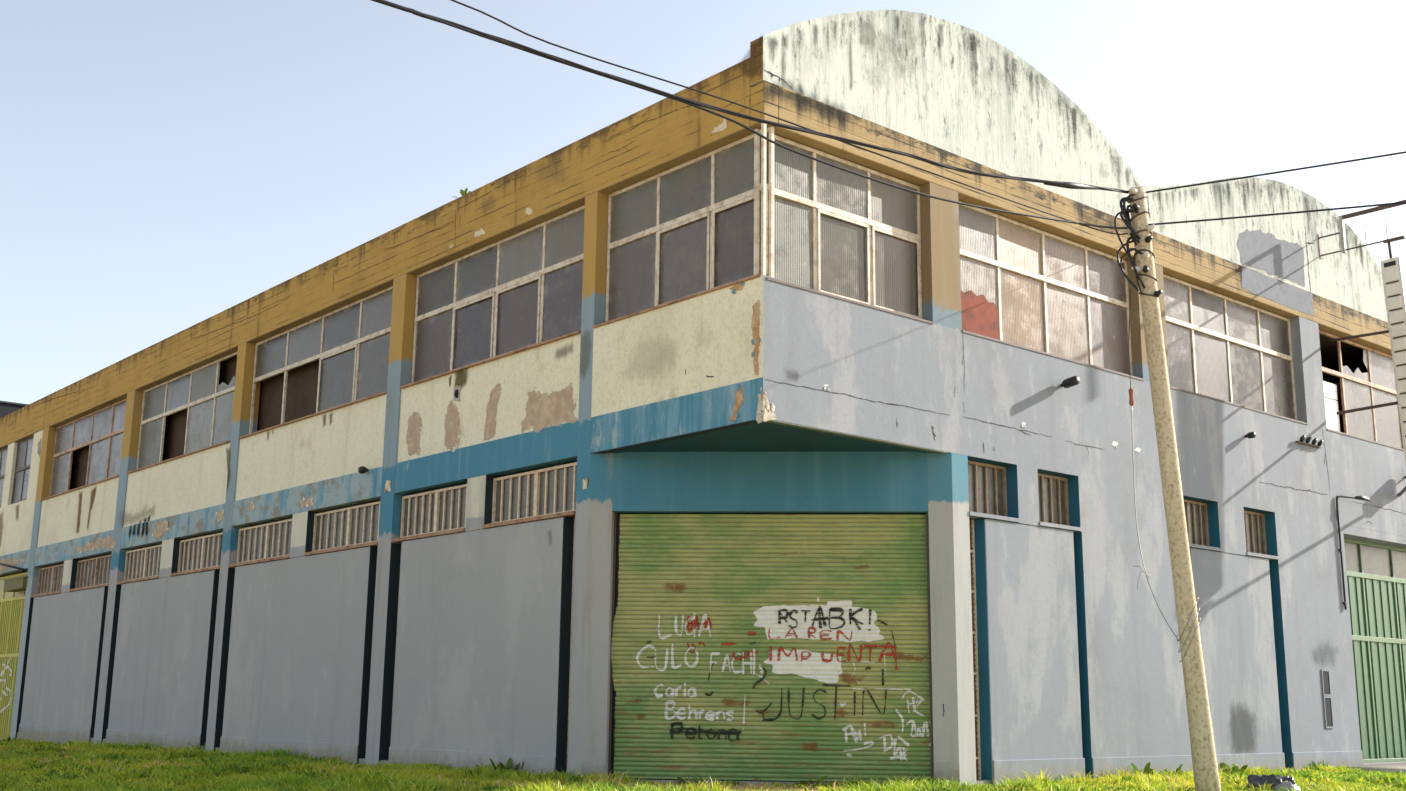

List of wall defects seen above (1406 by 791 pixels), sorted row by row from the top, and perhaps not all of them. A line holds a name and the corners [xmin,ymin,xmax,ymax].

damp [740,37,763,77]
damp [767,85,846,122]
peeling [729,300,776,423]
peeling [405,412,422,461]
peeling [444,386,461,452]
peeling [482,384,502,440]
peeling [520,383,577,434]